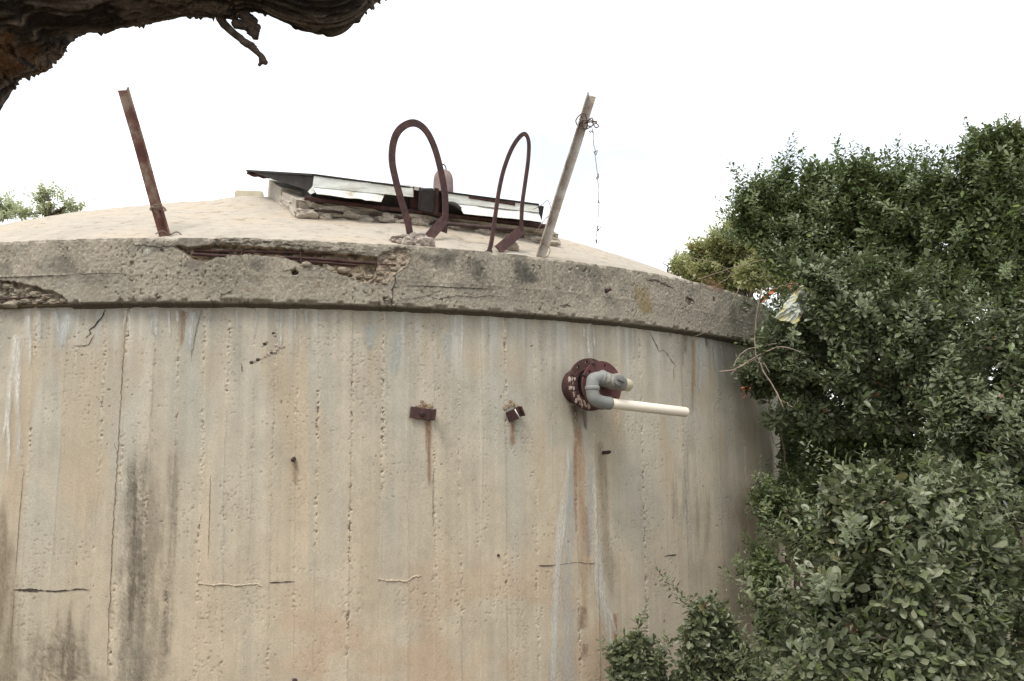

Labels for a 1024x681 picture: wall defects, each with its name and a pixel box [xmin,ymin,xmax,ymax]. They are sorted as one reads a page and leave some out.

spalling [0,280,68,308]
spalling [175,237,410,305]
crack [10,312,127,681]